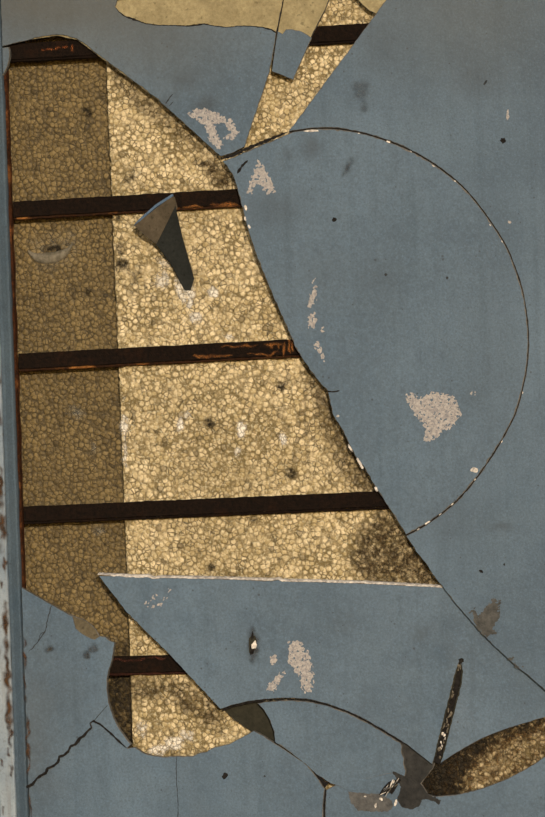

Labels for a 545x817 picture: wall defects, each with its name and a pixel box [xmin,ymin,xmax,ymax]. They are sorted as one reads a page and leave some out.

peeling [116,0,329,42]
peeling [188,108,240,149]
peeling [246,159,276,194]
peeling [307,278,325,362]
crack [221,128,529,536]
peeling [406,391,462,442]
peeling [469,598,501,637]
rust [3,611,13,743]
peeling [266,640,315,694]
crack [26,705,125,788]
crack [313,772,329,817]
peeling [348,731,441,812]